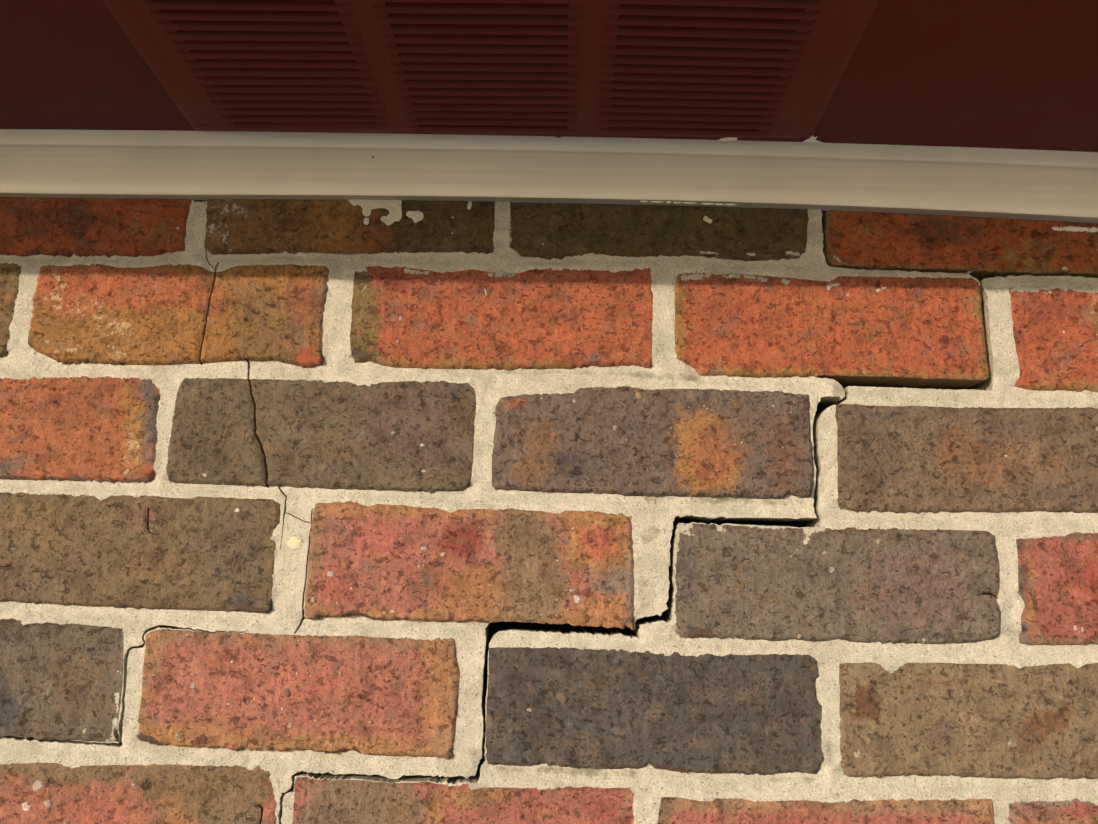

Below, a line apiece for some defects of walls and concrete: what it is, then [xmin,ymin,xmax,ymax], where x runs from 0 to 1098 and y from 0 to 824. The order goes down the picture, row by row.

crack [199,240,219,365]
crack [243,356,320,634]
crack [278,210,1098,824]
crack [0,625,245,747]